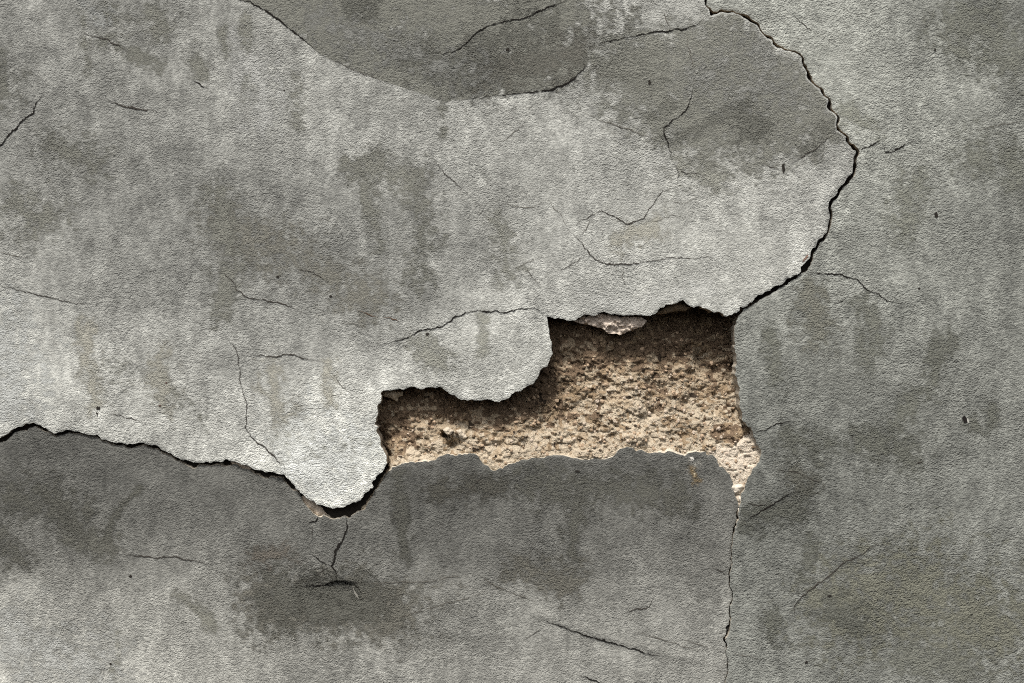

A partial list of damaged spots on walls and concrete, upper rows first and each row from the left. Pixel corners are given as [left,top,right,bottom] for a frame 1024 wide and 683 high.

crack [361,0,922,345]
spalling [706,0,860,272]
flaking render [1,295,769,657]
crack [0,338,818,676]